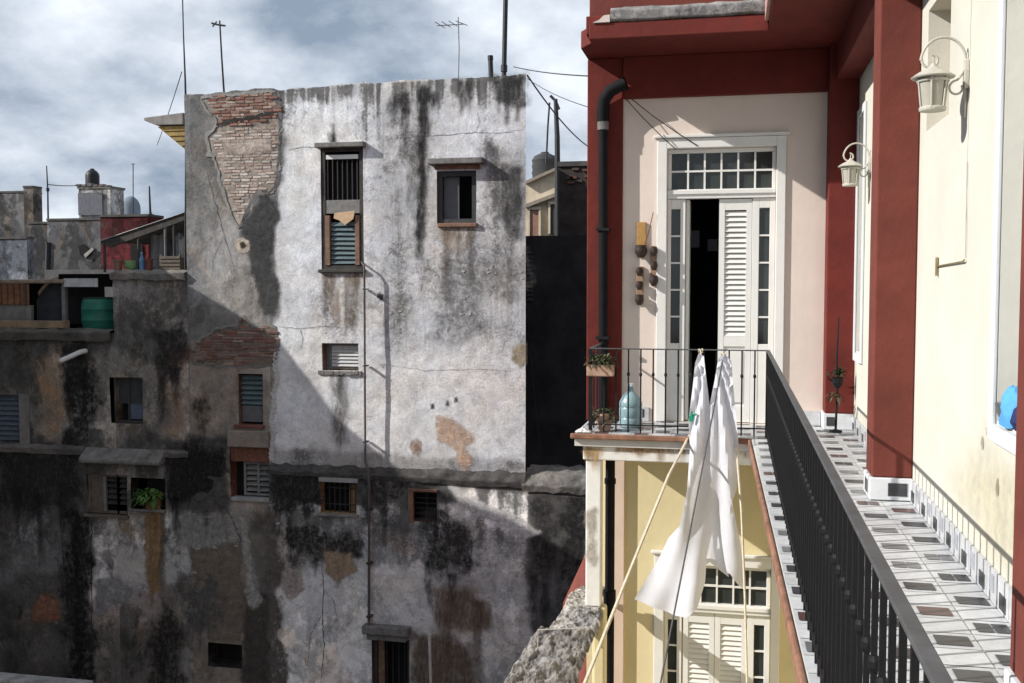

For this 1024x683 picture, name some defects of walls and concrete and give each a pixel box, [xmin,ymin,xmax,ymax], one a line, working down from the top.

leakage [490,73,528,121]
flaking render [200,89,284,253]
leakage [389,85,435,256]
leakage [500,165,524,233]
leakage [241,191,279,314]
flaking render [191,315,280,369]
leakage [165,399,232,531]
peeling [410,439,421,455]
peeling [431,397,473,469]
flaking render [323,551,357,581]
leakage [422,509,478,596]
leakage [462,495,586,615]